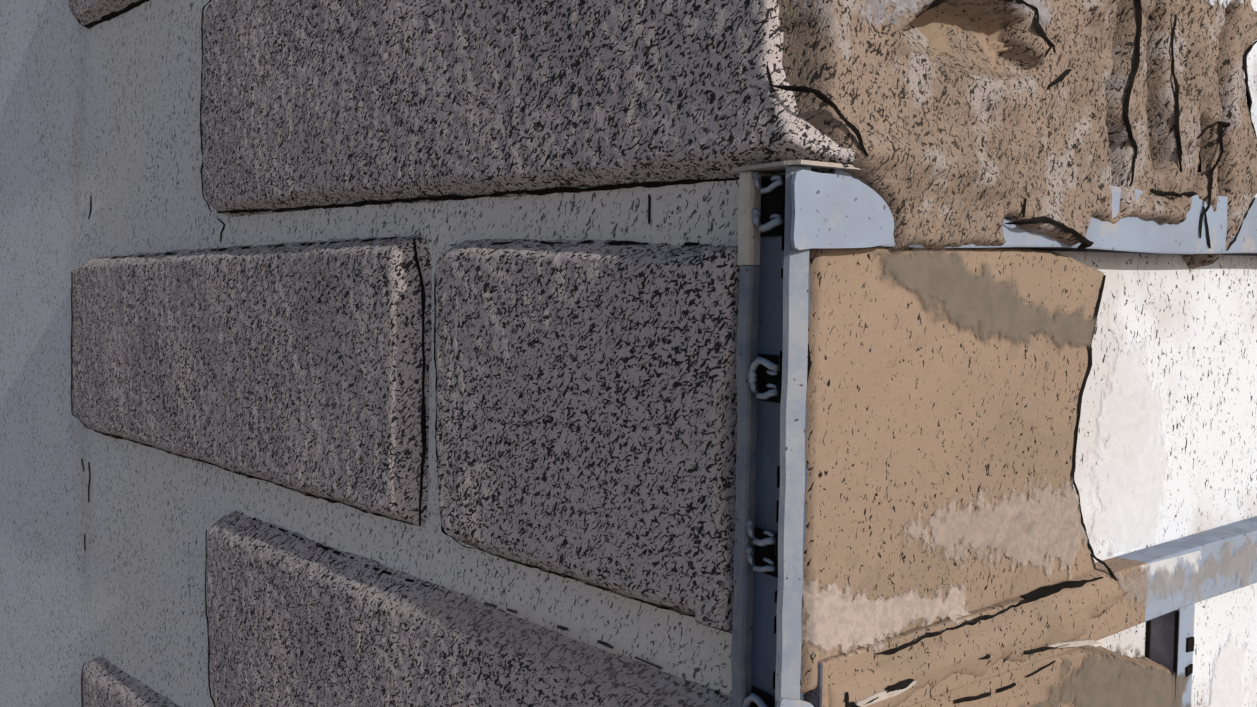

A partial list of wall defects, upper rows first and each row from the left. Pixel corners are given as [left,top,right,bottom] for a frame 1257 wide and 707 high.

crack [916,0,945,18]
spalling [901,1,1012,73]
crack [1003,0,1072,90]
crack [1108,0,1257,251]
crack [1004,198,1094,252]
crack [845,275,1118,707]
flaking render [1048,639,1101,648]
flaking render [855,681,917,707]